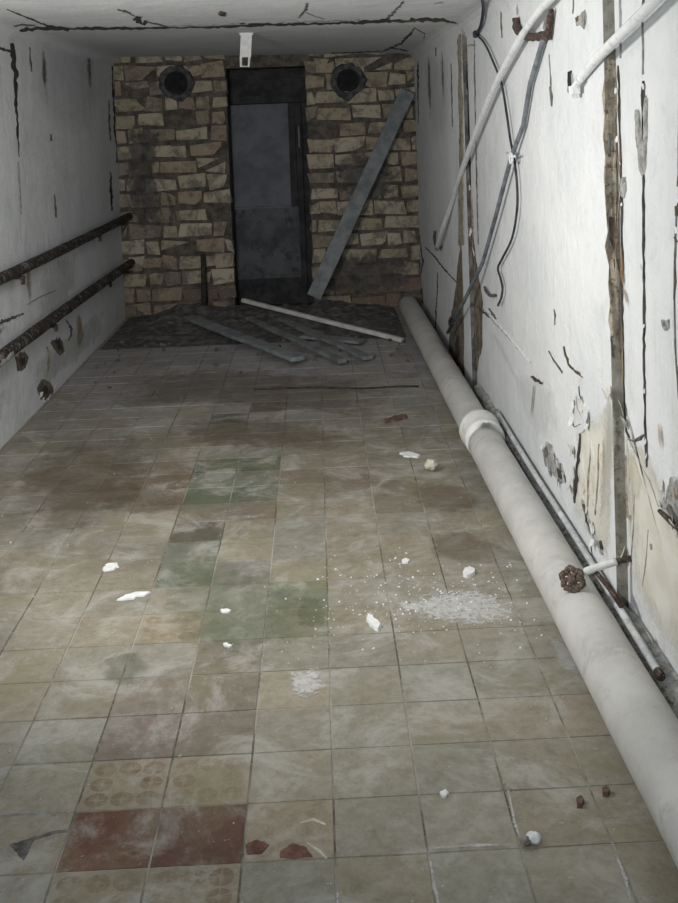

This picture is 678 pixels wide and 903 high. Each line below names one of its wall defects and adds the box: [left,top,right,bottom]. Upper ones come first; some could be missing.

peeling [0,290,56,325]
peeling [540,385,678,650]